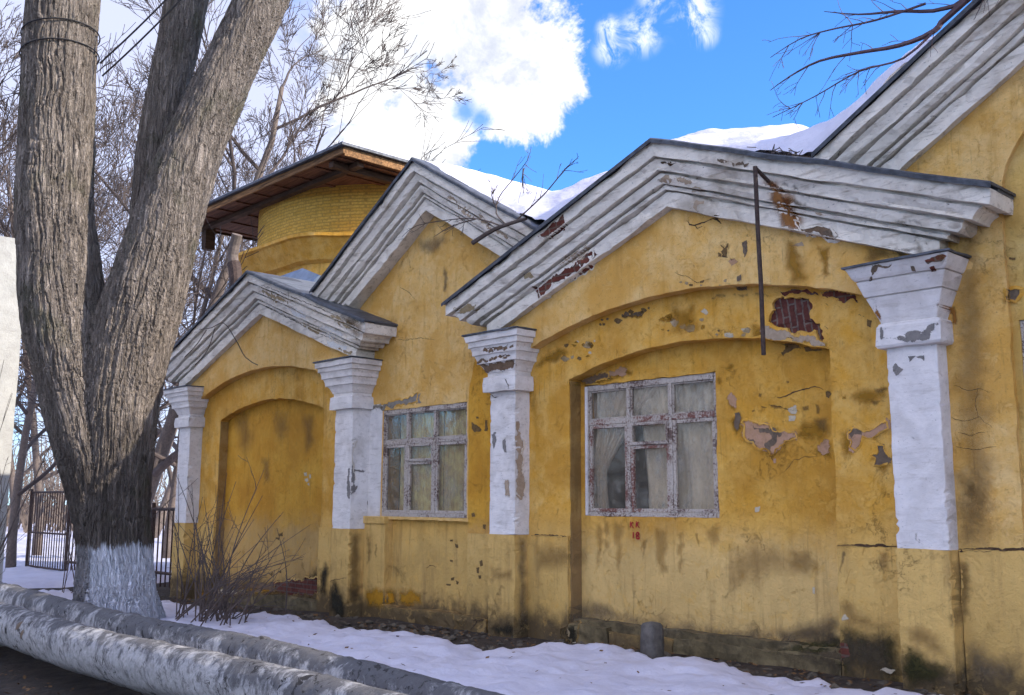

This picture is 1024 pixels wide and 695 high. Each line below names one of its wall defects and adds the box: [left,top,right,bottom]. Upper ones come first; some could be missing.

corrosion [768,181,801,232]
flaking render [524,245,598,299]
flaking render [477,345,515,373]
flaking render [715,289,858,356]
peeling [880,323,939,343]
peeling [347,441,365,499]
peeling [471,417,526,500]
flaking render [727,391,832,463]
flaking render [844,418,892,470]
damp [352,538,420,606]
crack [837,542,897,550]
crack [959,545,1024,553]